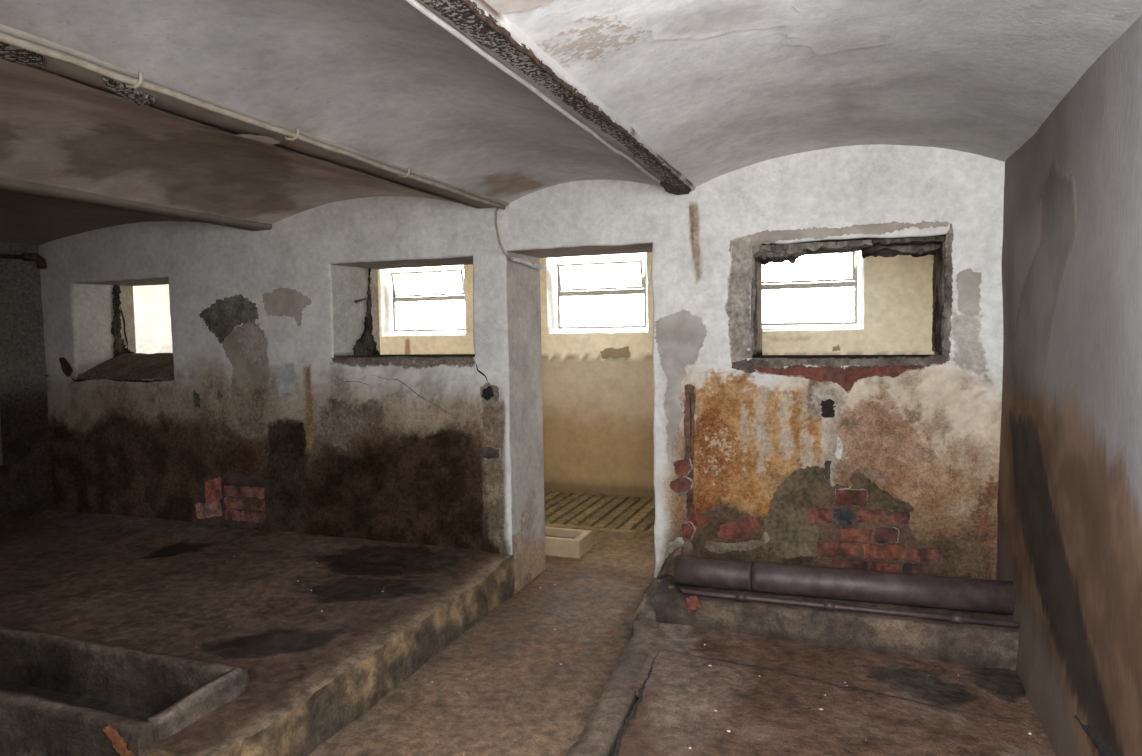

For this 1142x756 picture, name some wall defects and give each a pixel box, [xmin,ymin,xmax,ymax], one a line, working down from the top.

peeling [484,0,554,13]
damp [0,115,310,224]
flaking render [199,294,270,387]
flaking render [725,220,954,426]
flaking render [193,471,272,530]
damp [0,382,545,606]
rust [682,365,822,512]
flaking render [806,484,947,574]
rust [838,384,999,555]